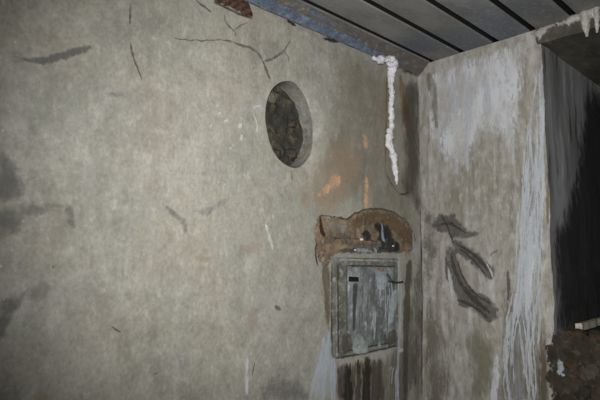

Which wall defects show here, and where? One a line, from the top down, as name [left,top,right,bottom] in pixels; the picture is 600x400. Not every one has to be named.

crack [175,3,290,79]
peeling [215,0,383,57]
water stain [533,14,581,41]
water stain [404,48,524,207]
spalling [315,208,416,324]
water stain [309,242,423,400]
water stain [503,68,548,400]